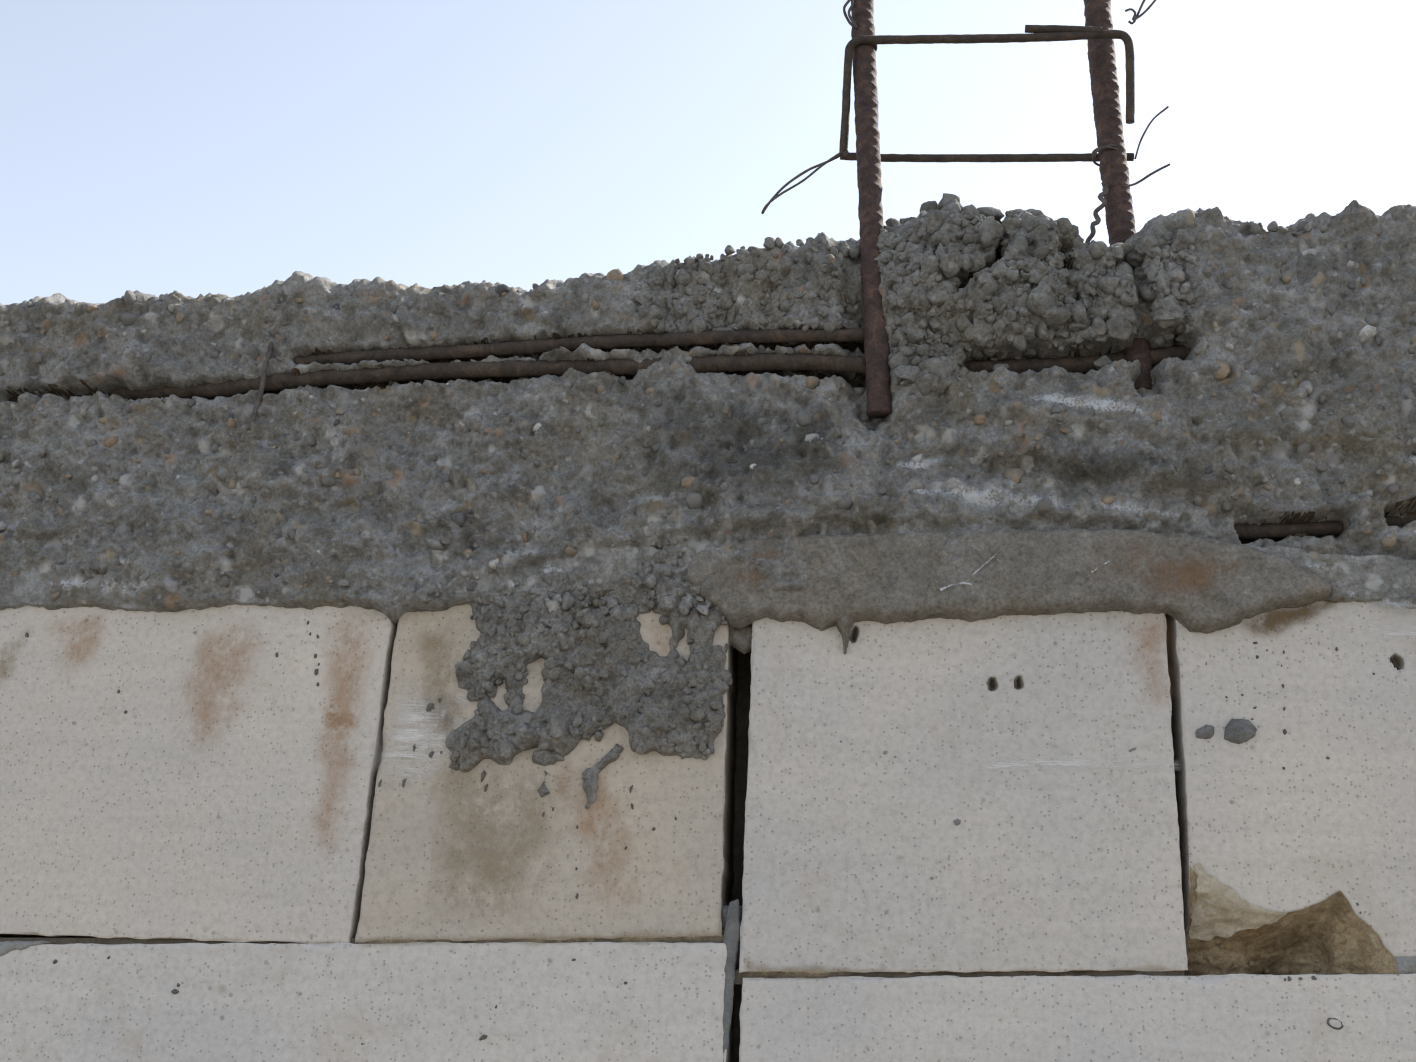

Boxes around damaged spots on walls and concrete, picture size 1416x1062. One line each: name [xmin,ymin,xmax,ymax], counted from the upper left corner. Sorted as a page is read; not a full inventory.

spalling [606,268,624,281]
spalling [1259,220,1372,316]
spalling [0,290,199,373]
spalling [1150,245,1287,442]
spalling [46,283,875,538]
spalling [964,344,1125,514]
spalling [1193,277,1416,552]
spalling [40,535,230,601]
spalling [392,508,542,592]
peeling [532,749,565,817]
peeling [582,744,624,809]
spalling [1185,863,1399,981]